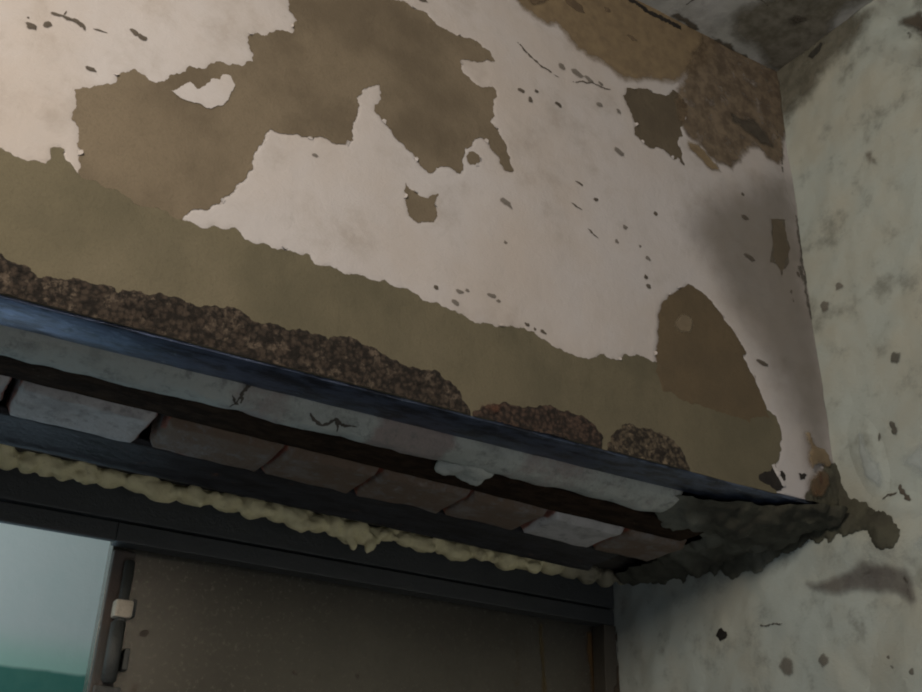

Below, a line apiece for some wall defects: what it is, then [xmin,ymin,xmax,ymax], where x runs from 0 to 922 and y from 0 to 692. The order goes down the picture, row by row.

peeling [0,0,786,494]
flaking render [770,219,790,278]
crack [230,385,251,407]
crack [310,413,356,431]